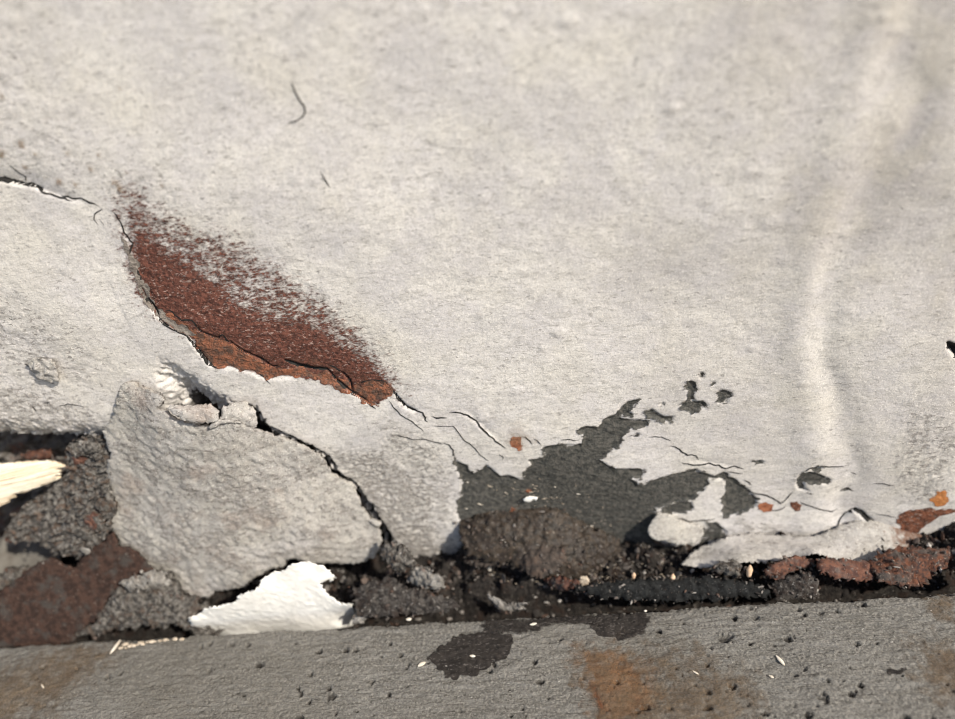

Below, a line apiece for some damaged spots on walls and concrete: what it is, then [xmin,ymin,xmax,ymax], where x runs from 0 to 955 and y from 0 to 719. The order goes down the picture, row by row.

rust [112,182,401,407]
crack [0,167,541,461]
crack [259,411,393,543]
peeling [452,372,761,550]
rust [758,502,773,512]
peeling [796,465,831,495]
rust [763,555,877,601]
rust [896,491,955,533]